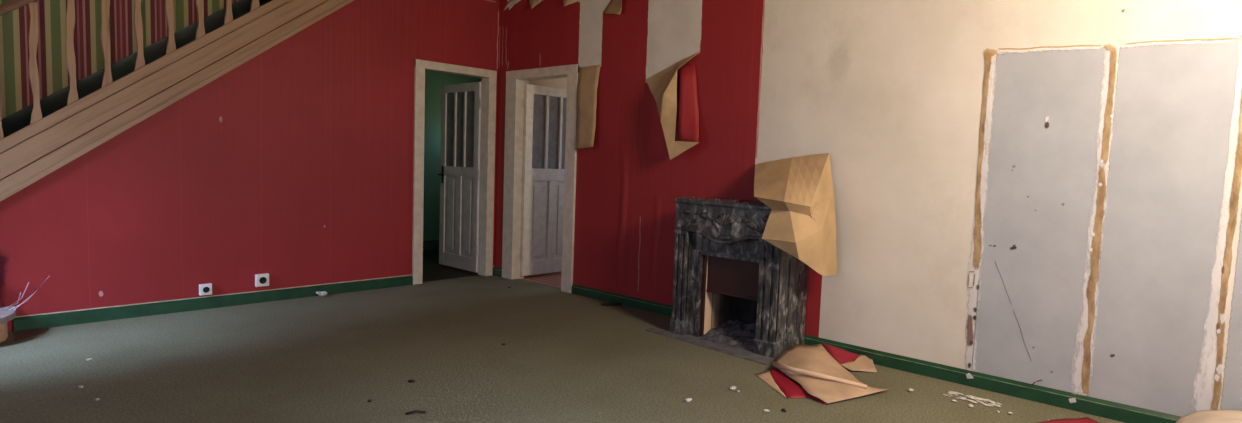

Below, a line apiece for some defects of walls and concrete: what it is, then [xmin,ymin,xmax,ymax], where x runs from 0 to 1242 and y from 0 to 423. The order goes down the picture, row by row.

flaking render [578,0,610,68]
flaking render [645,0,702,83]